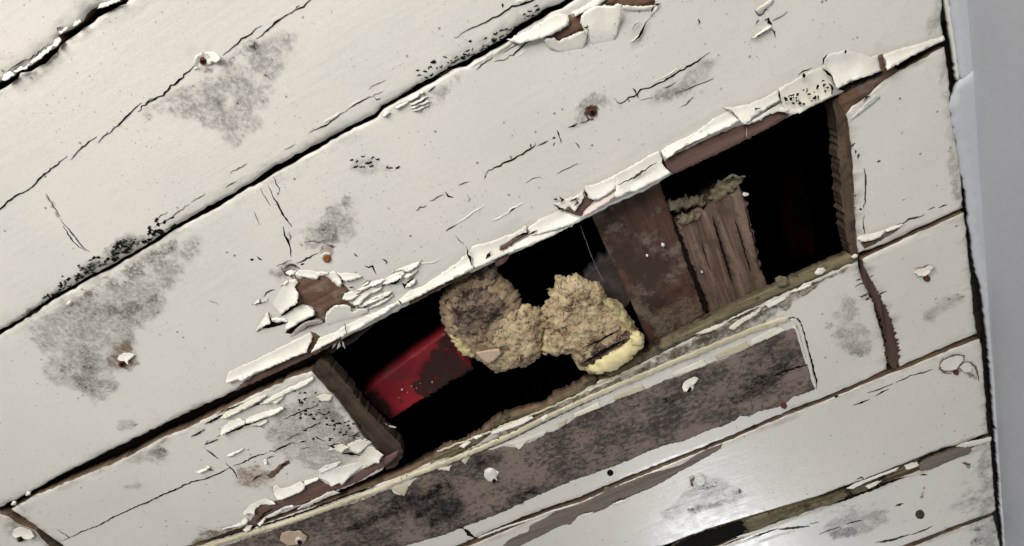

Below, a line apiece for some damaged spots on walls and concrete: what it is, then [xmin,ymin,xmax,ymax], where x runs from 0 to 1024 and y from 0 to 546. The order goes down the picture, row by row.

peeling [2,19,82,81]
crack [223,0,310,55]
peeling [507,0,660,52]
crack [615,54,712,106]
crack [0,66,194,252]
leakage [27,217,178,313]
crack [416,120,589,265]
peeling [226,36,945,391]
leakage [634,268,847,375]
crack [57,406,329,540]
peeling [191,328,815,546]
leakage [470,379,620,450]